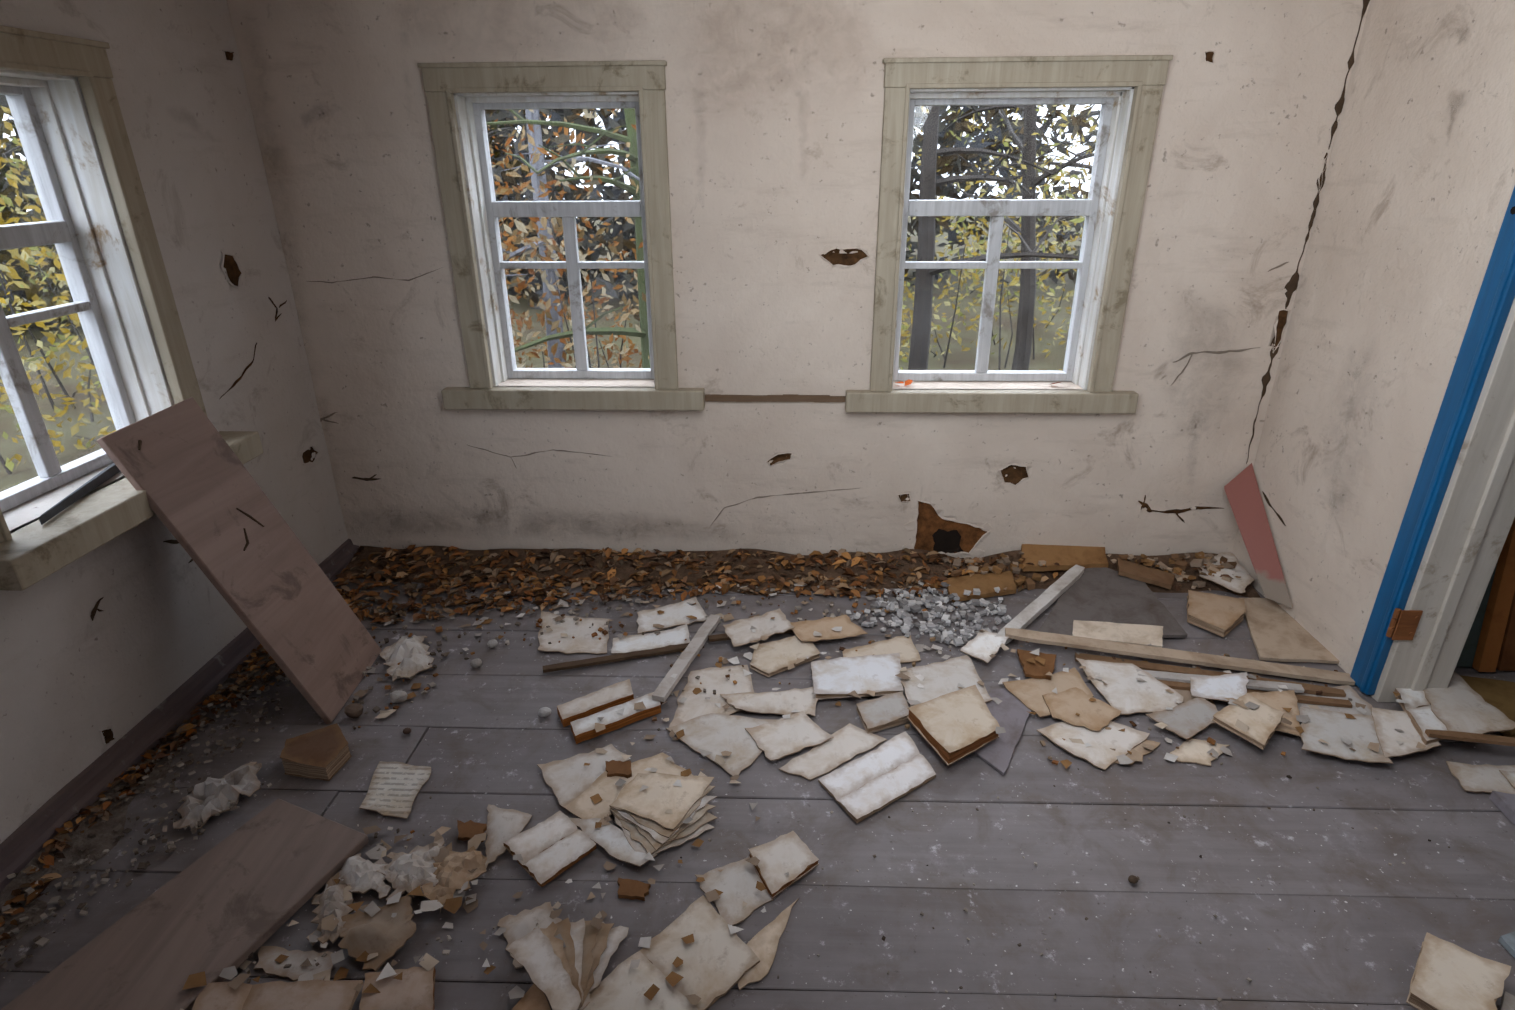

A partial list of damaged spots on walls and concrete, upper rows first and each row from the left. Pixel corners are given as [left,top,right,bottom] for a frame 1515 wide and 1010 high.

flaking render [818,244,871,271]
crack [1170,0,1370,526]
spalling [898,492,992,557]